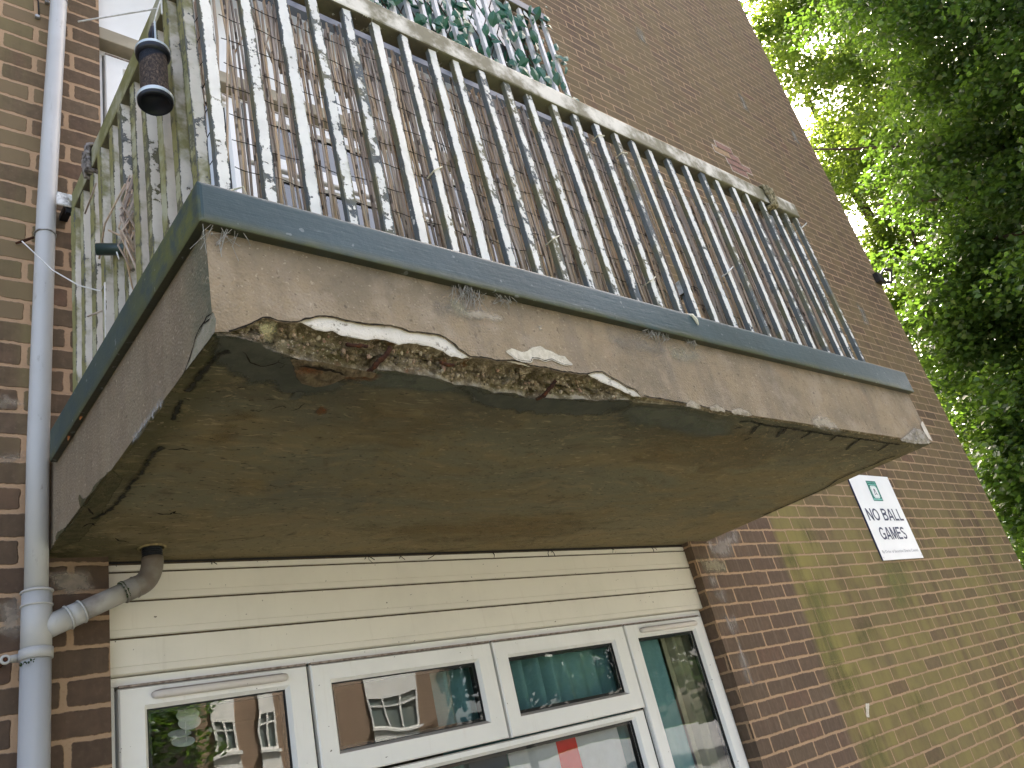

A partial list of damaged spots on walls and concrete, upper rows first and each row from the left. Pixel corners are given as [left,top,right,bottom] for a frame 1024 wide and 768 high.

spalling [184,313,932,444]